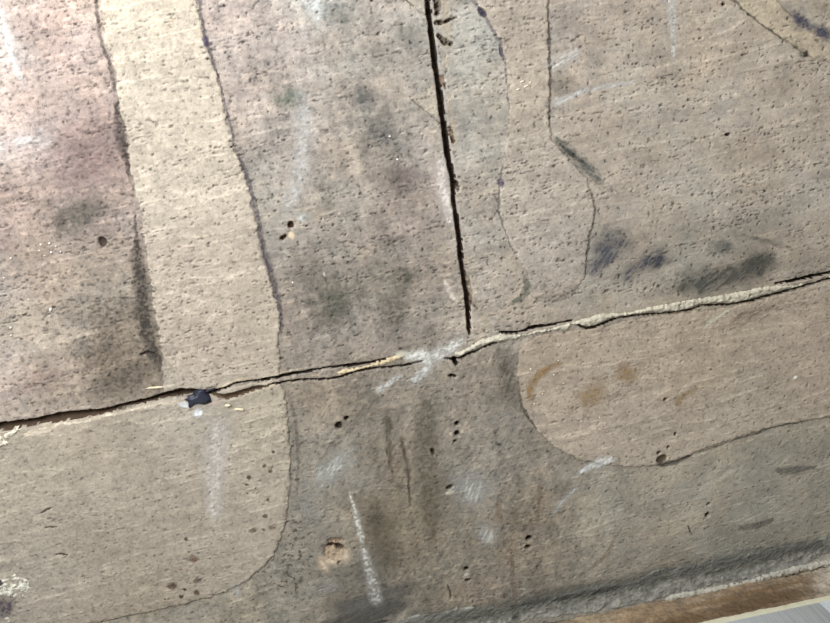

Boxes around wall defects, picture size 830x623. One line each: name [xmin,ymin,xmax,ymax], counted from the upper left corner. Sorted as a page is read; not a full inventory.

crack [406,0,830,366]
crack [0,358,423,431]